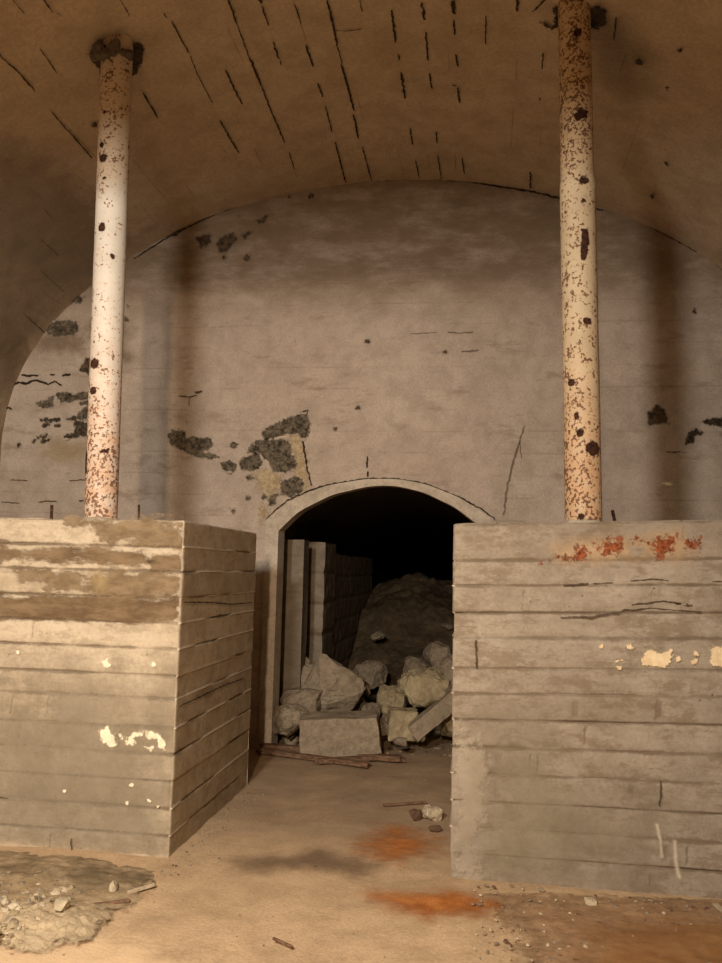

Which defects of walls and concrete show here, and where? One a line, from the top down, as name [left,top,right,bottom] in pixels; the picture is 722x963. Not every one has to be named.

spalling [87,38,144,76]
crack [225,0,295,169]
crack [305,0,560,199]
crack [6,373,70,409]
peeling [17,391,89,447]
peeling [647,405,667,426]
peeling [685,417,722,445]
peeling [167,413,313,518]
crack [245,426,525,520]
rust [540,532,702,565]
crack [560,578,701,619]
peeling [641,646,722,668]